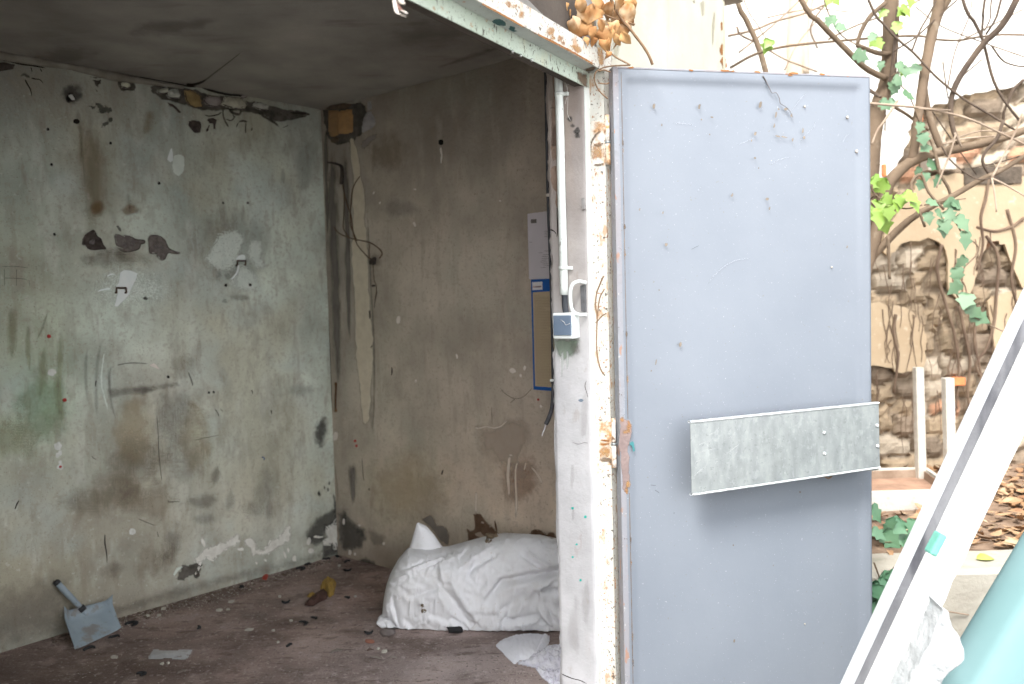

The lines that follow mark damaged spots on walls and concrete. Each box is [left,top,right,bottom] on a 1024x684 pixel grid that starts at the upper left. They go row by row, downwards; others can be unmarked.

corrosion [482,2,524,27]
corrosion [535,28,604,87]
water stain [90,103,112,128]
flaking render [151,86,310,134]
flaking render [81,229,181,261]
flaking render [323,103,381,424]
corrosion [599,331,632,516]
water stain [506,464,533,499]
water stain [307,482,375,565]
peeling [467,513,499,541]